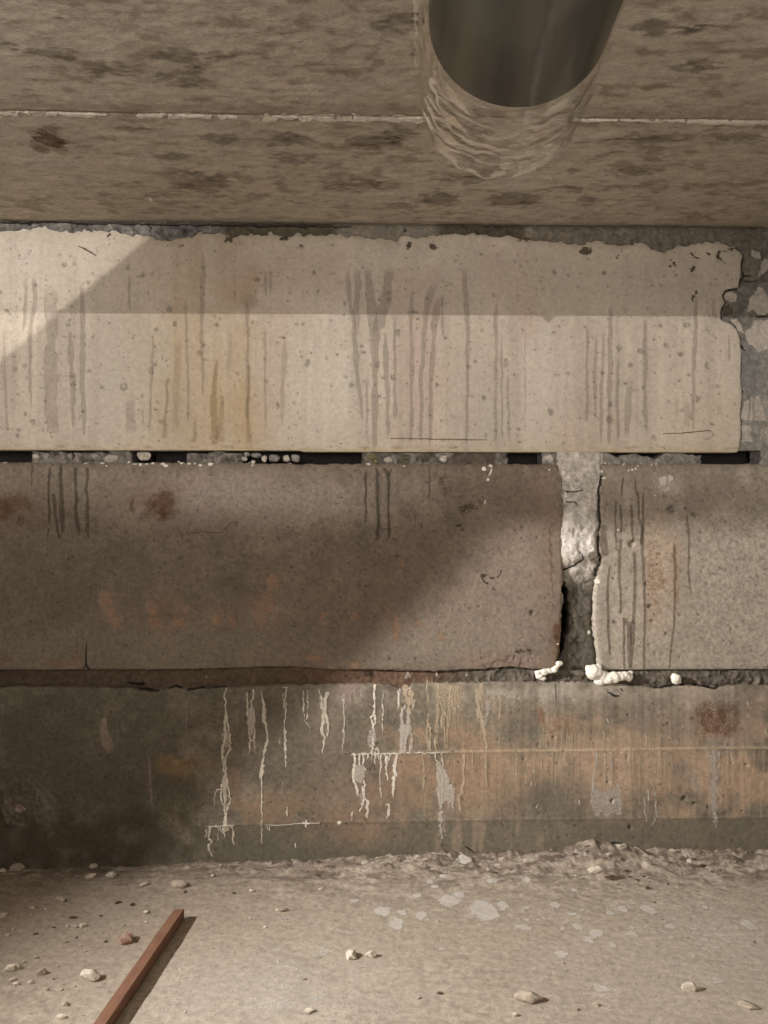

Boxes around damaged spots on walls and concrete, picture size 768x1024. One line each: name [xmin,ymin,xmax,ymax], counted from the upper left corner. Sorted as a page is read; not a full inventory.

spalling [720,289,744,334]
damp [48,462,107,537]
crack [562,475,602,576]
damp [205,686,319,857]
damp [302,680,505,839]